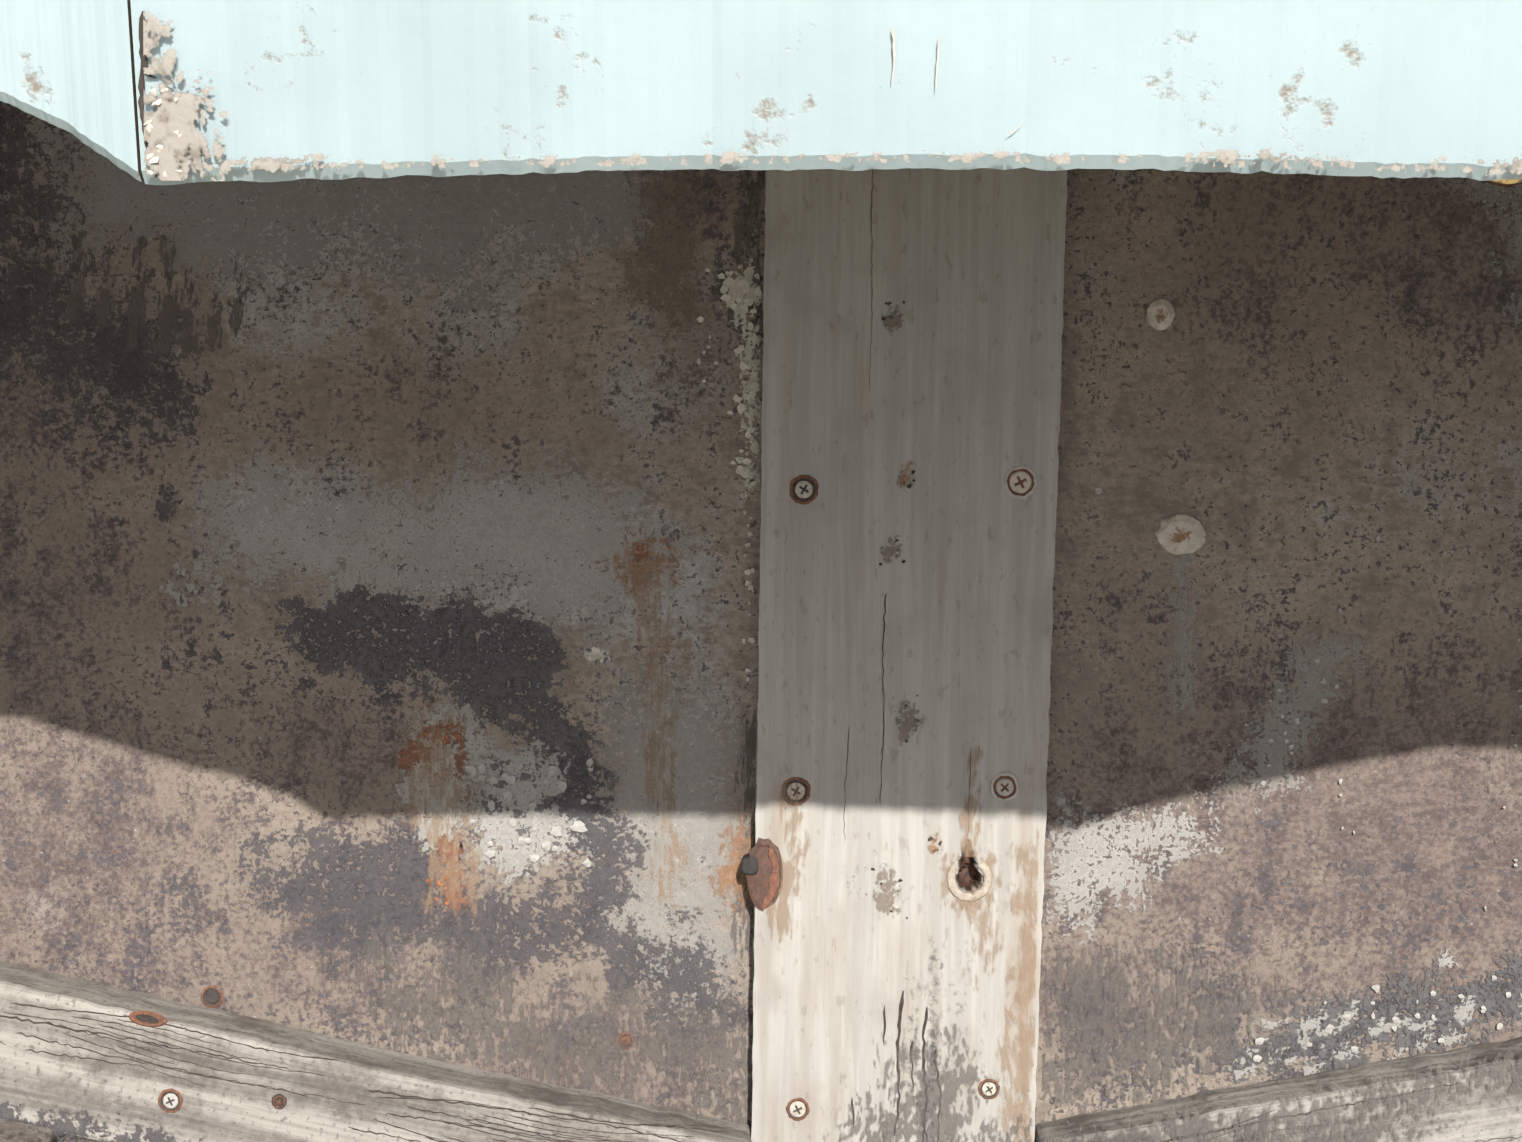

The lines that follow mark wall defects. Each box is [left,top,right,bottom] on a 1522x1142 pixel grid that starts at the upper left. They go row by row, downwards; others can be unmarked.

damp [0,101,252,455]
damp [179,154,491,173]
damp [596,154,709,337]
damp [704,150,1086,350]
damp [153,484,183,524]
rust [388,701,505,914]
damp [234,710,756,1125]
rust [711,809,754,916]
damp [0,1101,204,1142]
damp [839,942,1522,1142]